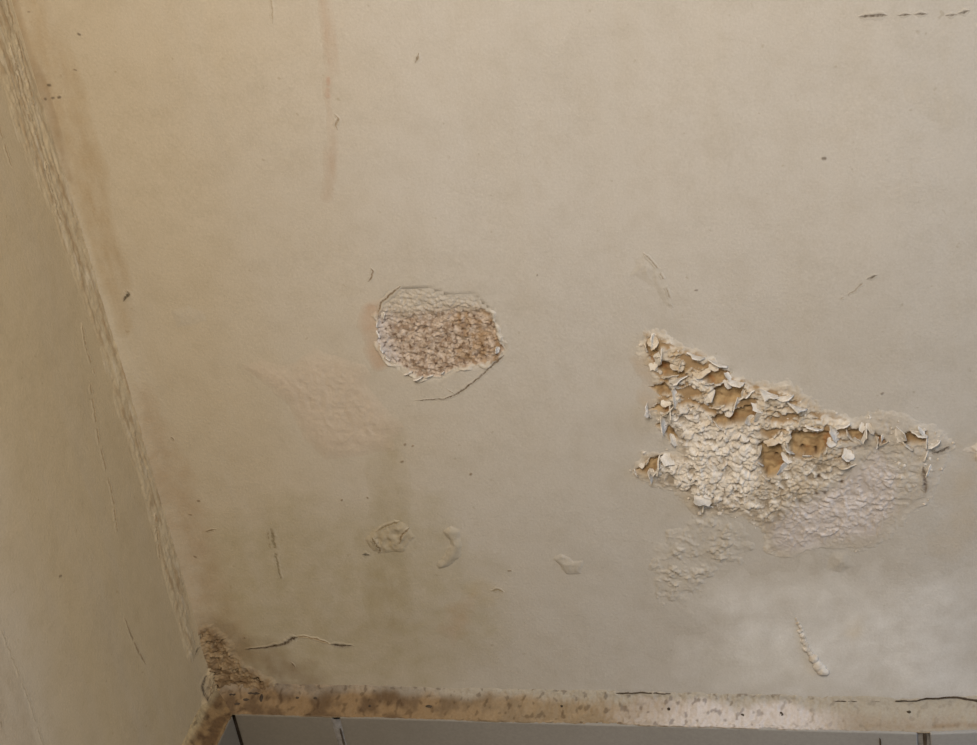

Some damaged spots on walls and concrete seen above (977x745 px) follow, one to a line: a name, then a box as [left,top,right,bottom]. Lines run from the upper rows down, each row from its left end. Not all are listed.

spalling [371,288,508,383]
crack [414,355,505,401]
spalling [629,325,977,558]
peeling [362,519,416,559]
crack [245,633,354,668]